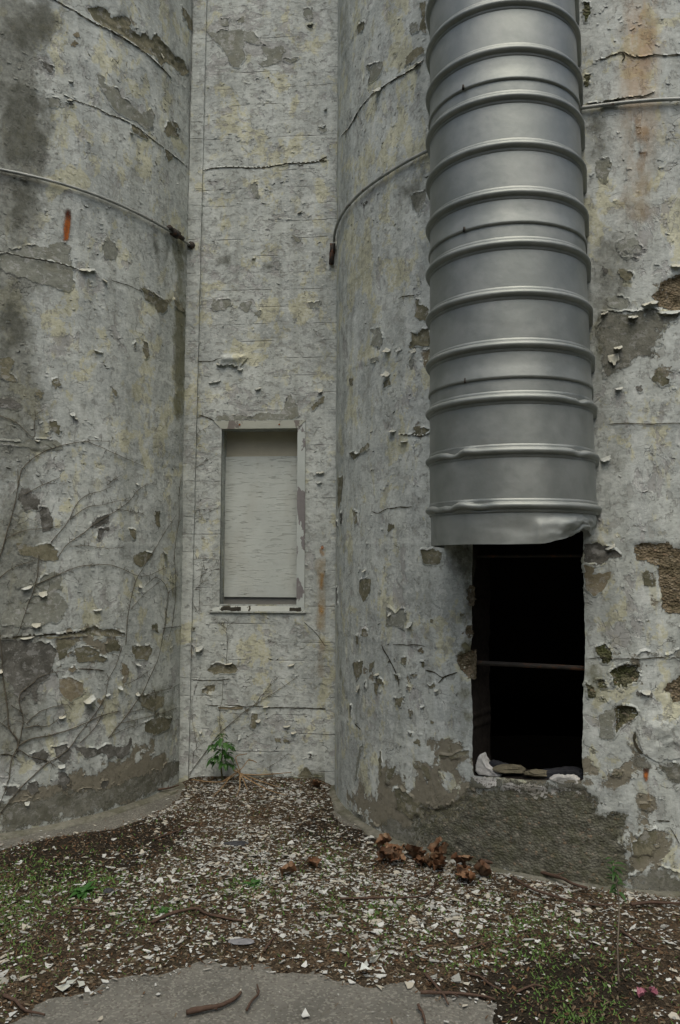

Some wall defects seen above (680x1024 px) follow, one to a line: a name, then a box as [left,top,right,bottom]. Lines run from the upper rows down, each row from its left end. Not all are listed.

peeling [86,6,191,181]
peeling [181,4,193,31]
crack [63,93,327,171]
crack [341,61,422,136]
crack [596,51,680,61]
peeling [594,238,680,394]
spalling [0,343,680,1024]